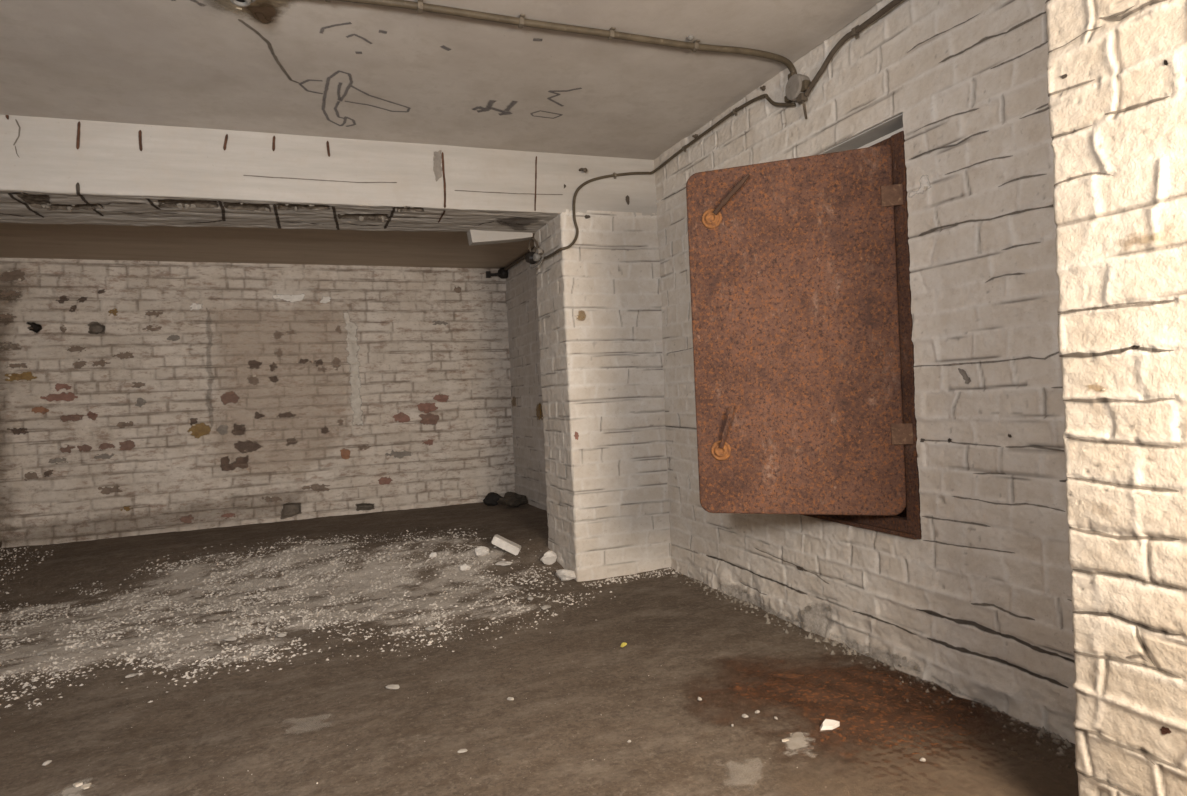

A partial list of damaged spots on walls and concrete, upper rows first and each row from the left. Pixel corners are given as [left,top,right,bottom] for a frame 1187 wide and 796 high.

crack [238,19,300,84]
crack [74,121,82,150]
crack [136,130,144,151]
crack [76,182,226,223]
crack [243,136,563,230]
spalling [27,322,42,333]
spalling [88,309,118,334]
peeling [32,383,98,422]
peeling [393,394,449,425]
peeling [24,421,135,481]
peeling [188,412,264,471]
rust [696,658,1013,763]